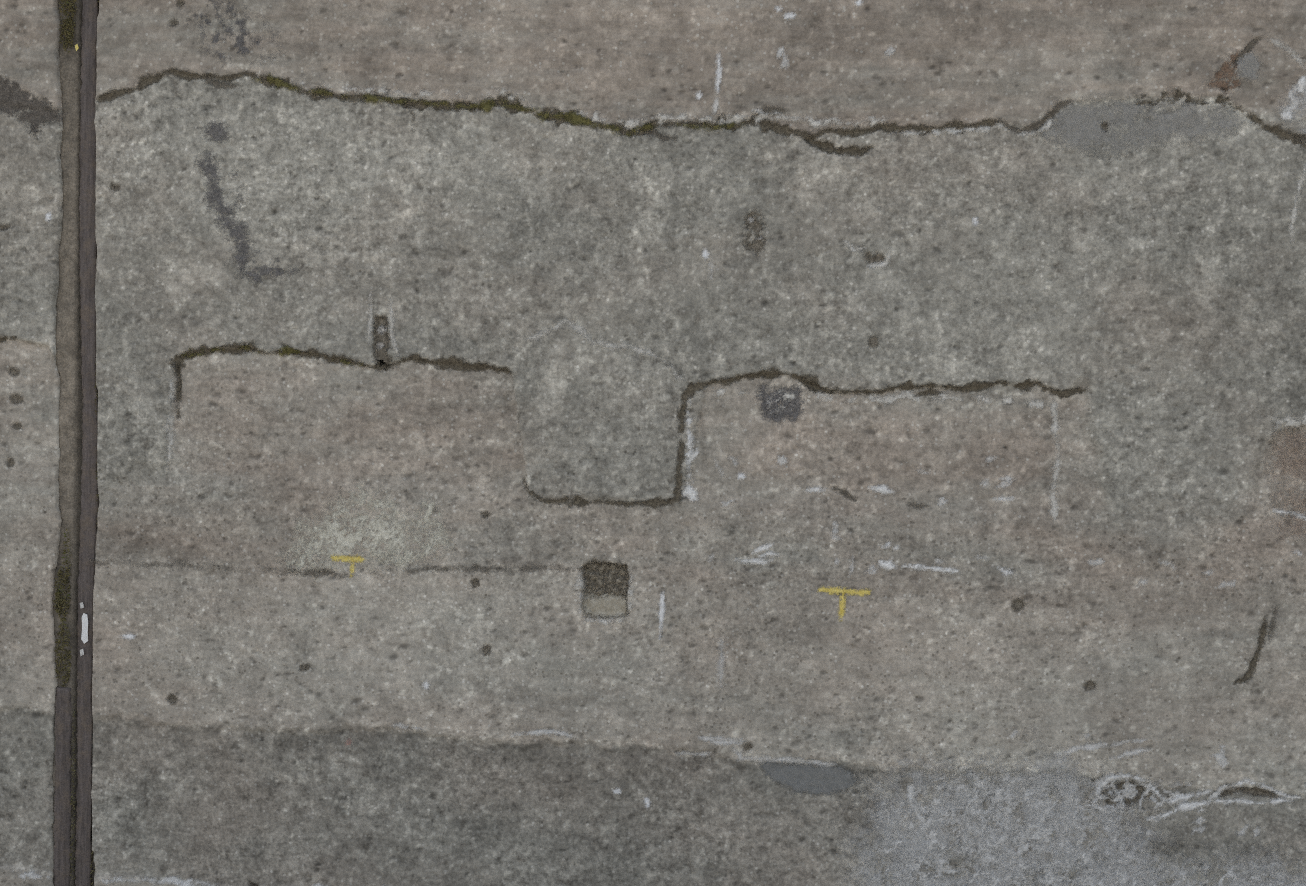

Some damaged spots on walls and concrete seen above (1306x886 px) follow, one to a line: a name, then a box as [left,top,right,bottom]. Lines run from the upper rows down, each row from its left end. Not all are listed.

crack [96,68,1070,156]
water stain [1281,77,1306,120]
crack [165,340,511,462]
crack [523,320,1086,519]